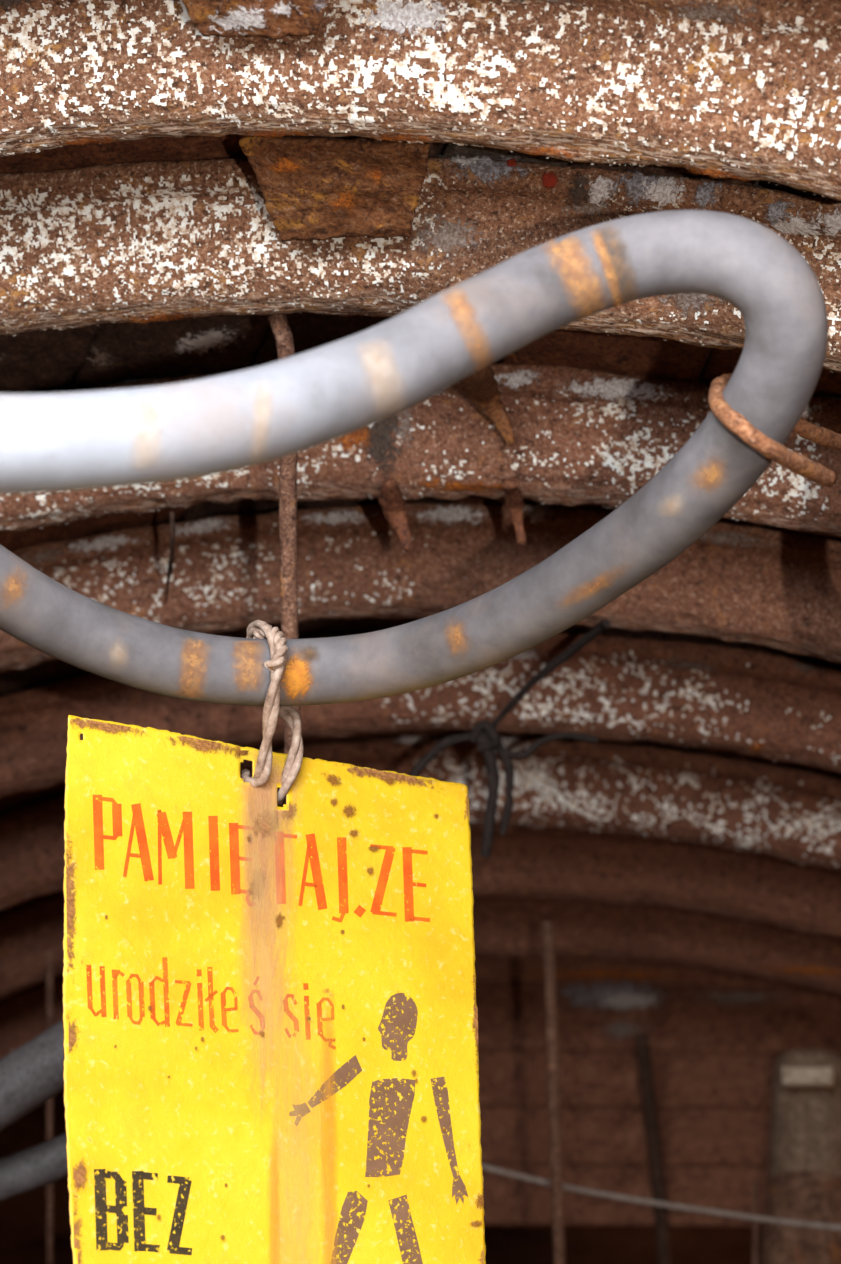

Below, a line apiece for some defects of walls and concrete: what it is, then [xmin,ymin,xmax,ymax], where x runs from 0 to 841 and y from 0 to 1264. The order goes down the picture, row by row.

rust [516,146,572,158]
rust [269,157,306,173]
rust [682,167,746,181]
rust [596,241,632,307]
efflorescence [169,323,246,354]
leakage [395,736,438,744]
leakage [494,736,571,757]